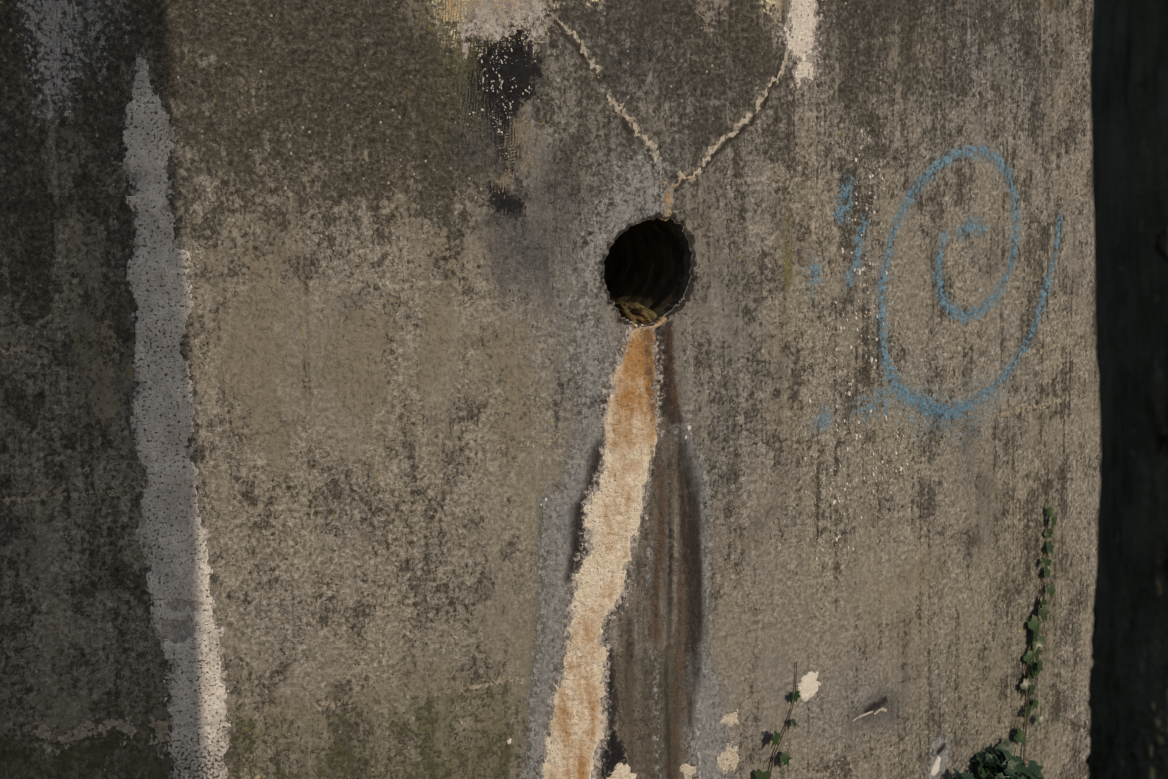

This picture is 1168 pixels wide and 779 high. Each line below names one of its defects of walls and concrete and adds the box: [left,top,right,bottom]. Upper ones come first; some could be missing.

crack [553,13,790,221]
leakage [760,0,829,92]
leakage [768,194,816,288]
leakage [17,0,233,779]
leakage [423,0,734,779]